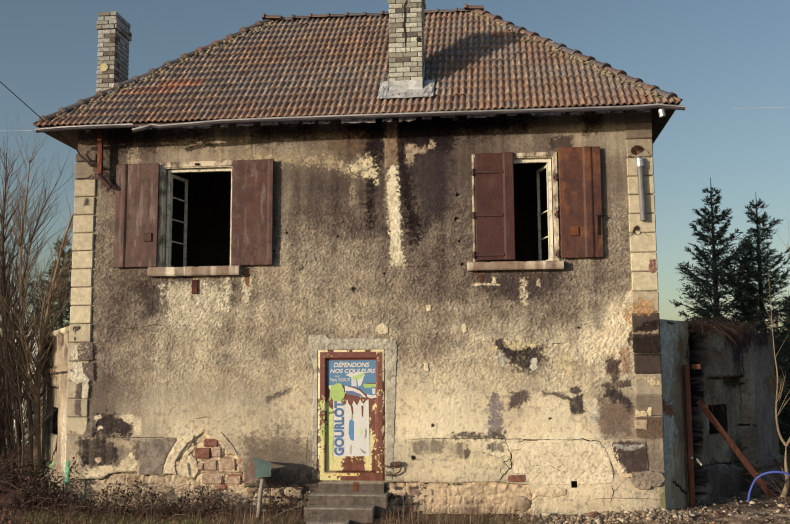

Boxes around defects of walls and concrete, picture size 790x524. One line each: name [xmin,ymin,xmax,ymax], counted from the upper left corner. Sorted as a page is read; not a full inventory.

crack [401,0,409,51]
water stain [127,144,141,164]
water stain [161,114,534,307]
water stain [158,276,232,331]
flaking render [585,290,634,373]
peeling [631,320,679,490]
flaking render [82,414,310,511]
crack [412,437,687,500]